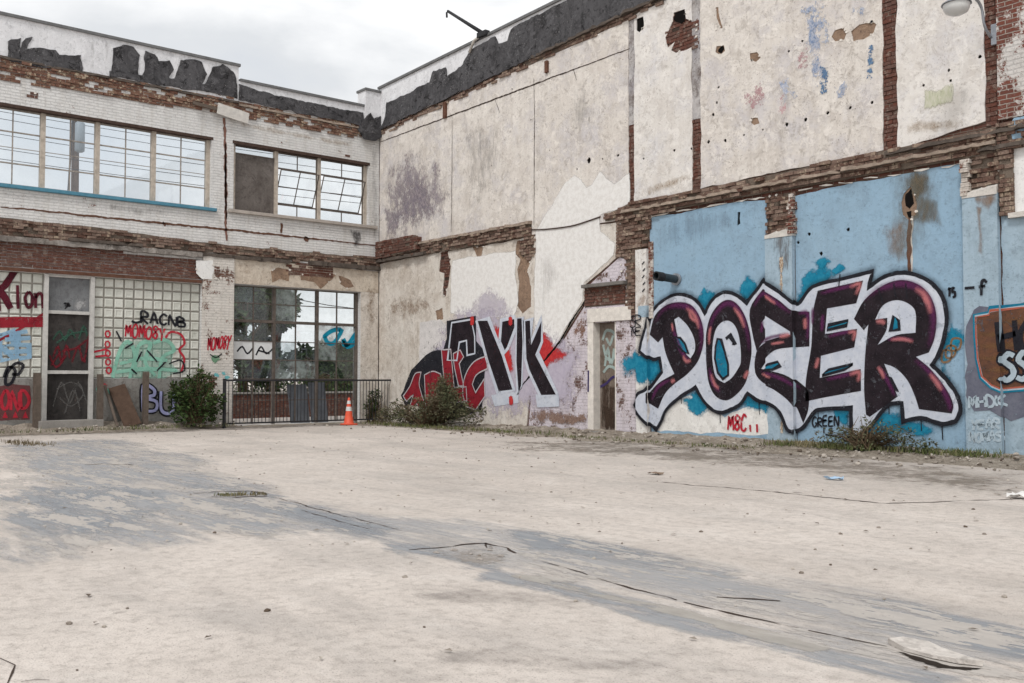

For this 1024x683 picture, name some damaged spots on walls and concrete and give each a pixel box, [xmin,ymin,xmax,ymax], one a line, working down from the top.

flaking render [665,9,699,53]
peeling [788,1,877,109]
water stain [385,158,445,236]
flaking render [271,267,354,289]
crack [208,491,516,553]